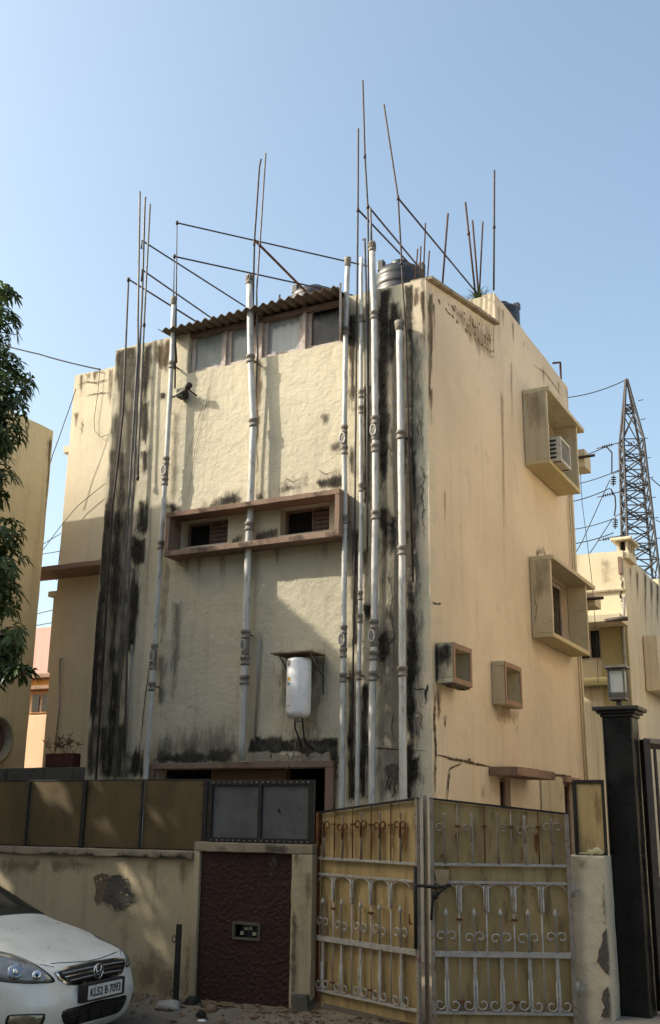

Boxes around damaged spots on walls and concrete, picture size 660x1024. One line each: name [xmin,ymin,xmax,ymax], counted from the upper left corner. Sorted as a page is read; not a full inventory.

peeling [438,299,494,358]
leakage [80,340,235,778]
mould [198,493,269,512]
leakage [248,285,435,799]
crack [365,684,491,799]
flaking render [93,873,135,911]
spalling [597,929,610,1018]